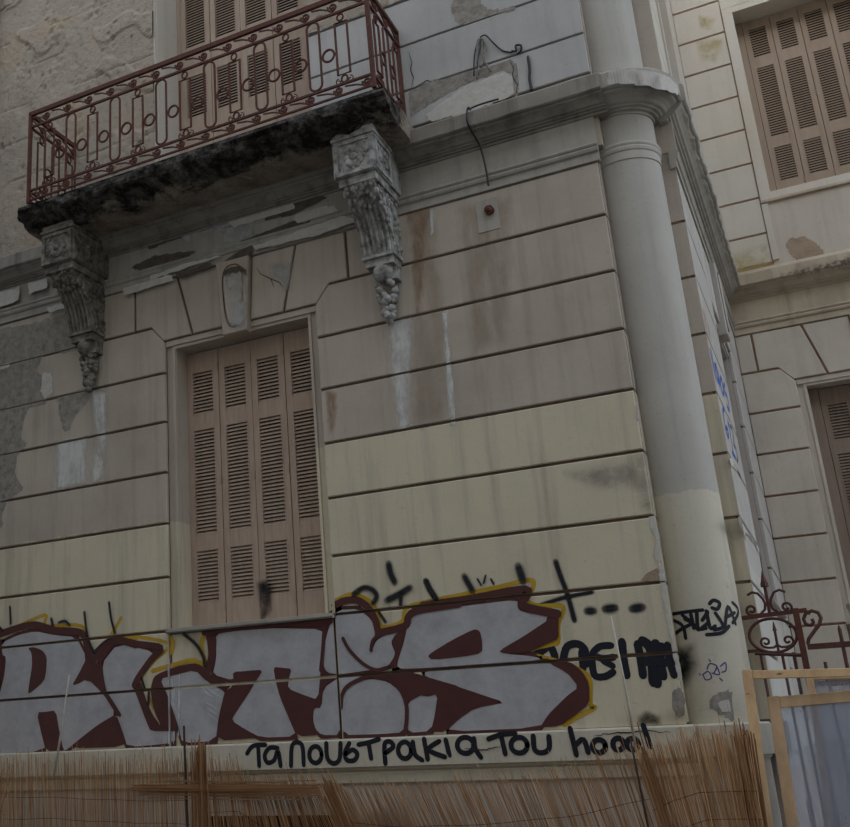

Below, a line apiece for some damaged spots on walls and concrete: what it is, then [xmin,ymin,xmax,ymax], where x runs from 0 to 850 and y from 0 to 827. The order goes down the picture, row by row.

flaking render [451,0,515,25]
flaking render [408,59,519,122]
peeling [0,279,47,307]
peeling [122,196,355,295]
flaking render [784,236,850,277]
flaking render [0,303,93,528]
damp [389,319,411,428]
damp [442,312,456,425]